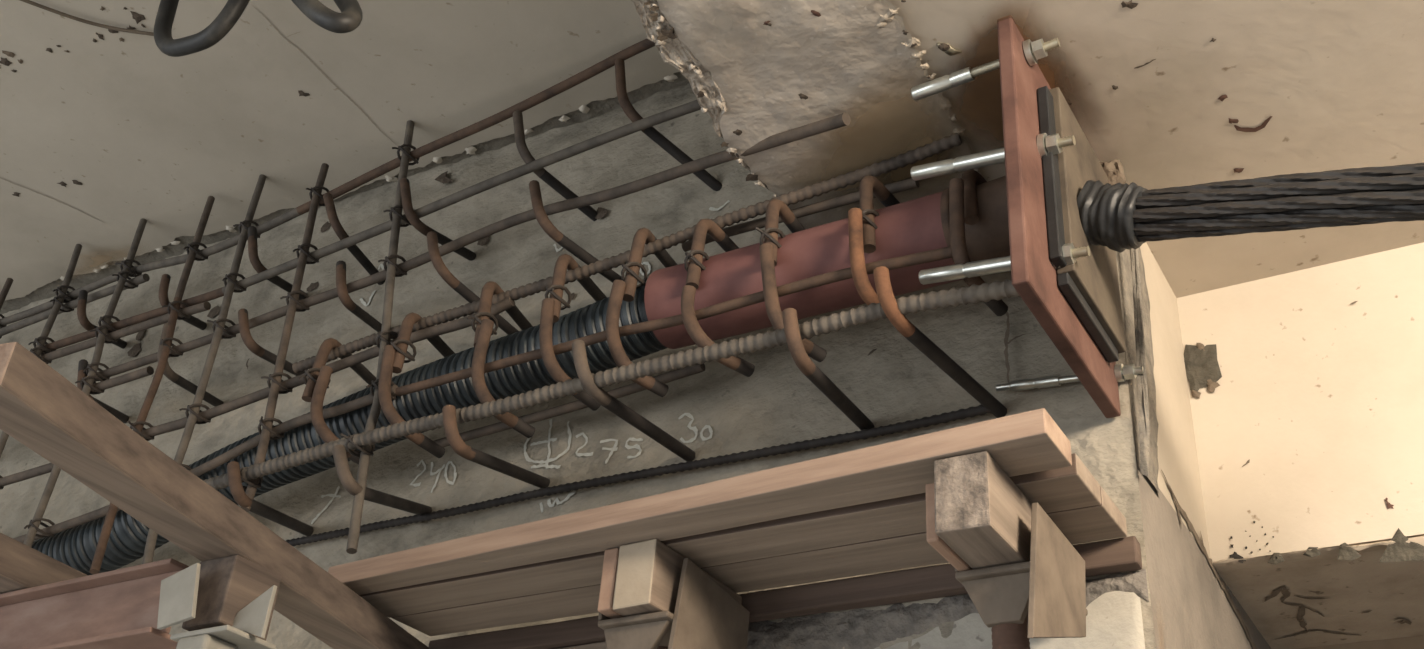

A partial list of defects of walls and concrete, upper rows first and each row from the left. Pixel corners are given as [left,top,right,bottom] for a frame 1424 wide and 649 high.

rust [955,12,1037,148]
rust [1037,57,1087,114]
spalling [0,0,778,314]
spalling [1184,343,1222,399]
crack [1161,470,1412,649]
spalling [1212,528,1424,572]